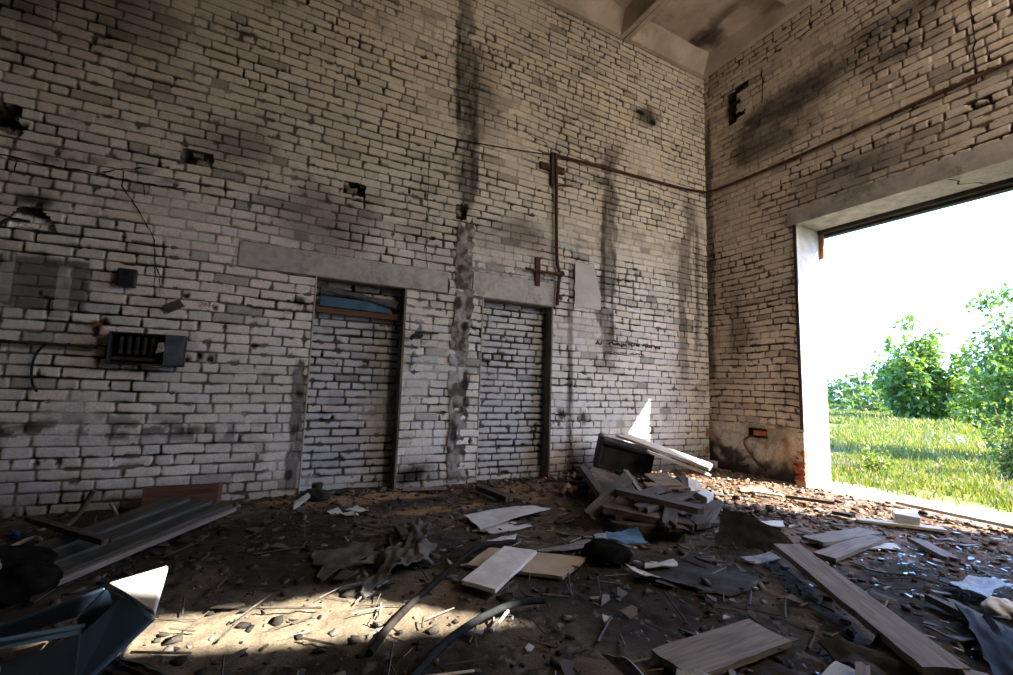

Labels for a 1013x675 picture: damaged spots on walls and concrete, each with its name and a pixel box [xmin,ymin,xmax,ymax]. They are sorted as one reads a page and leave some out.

spalling [0,101,27,137]